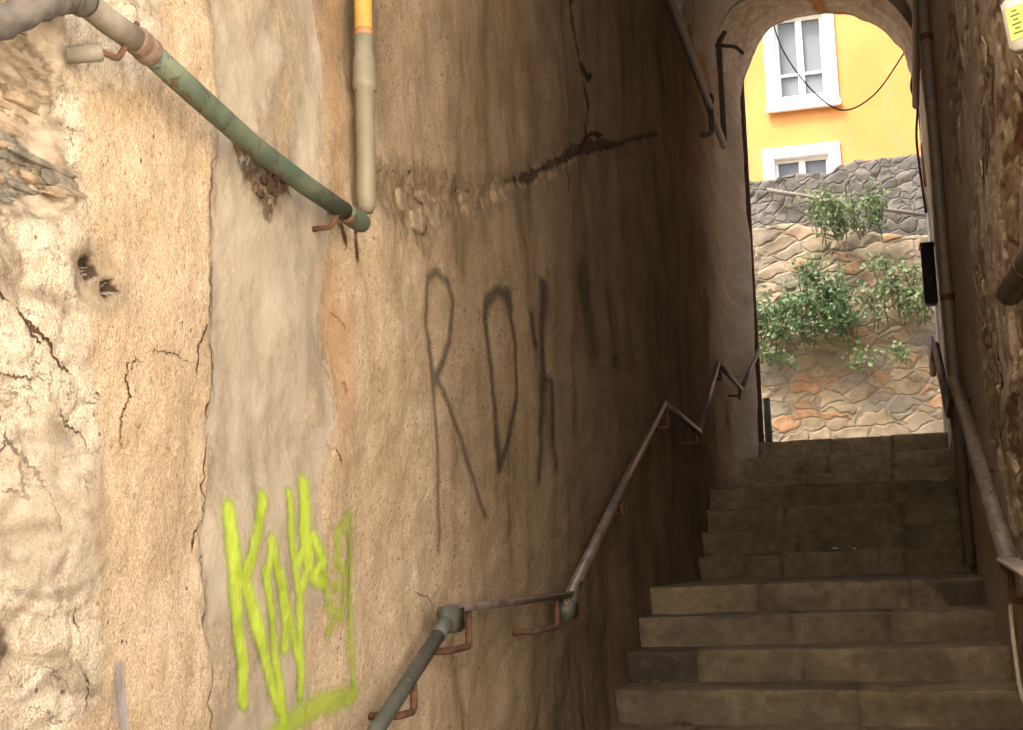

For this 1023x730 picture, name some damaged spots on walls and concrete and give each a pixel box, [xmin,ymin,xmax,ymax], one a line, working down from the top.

spalling [0,16,87,220]
crack [504,0,658,196]
spalling [376,154,580,252]
crack [0,291,70,381]
spalling [75,249,119,308]
crack [0,415,63,533]
crack [61,413,88,449]
crack [120,156,217,728]